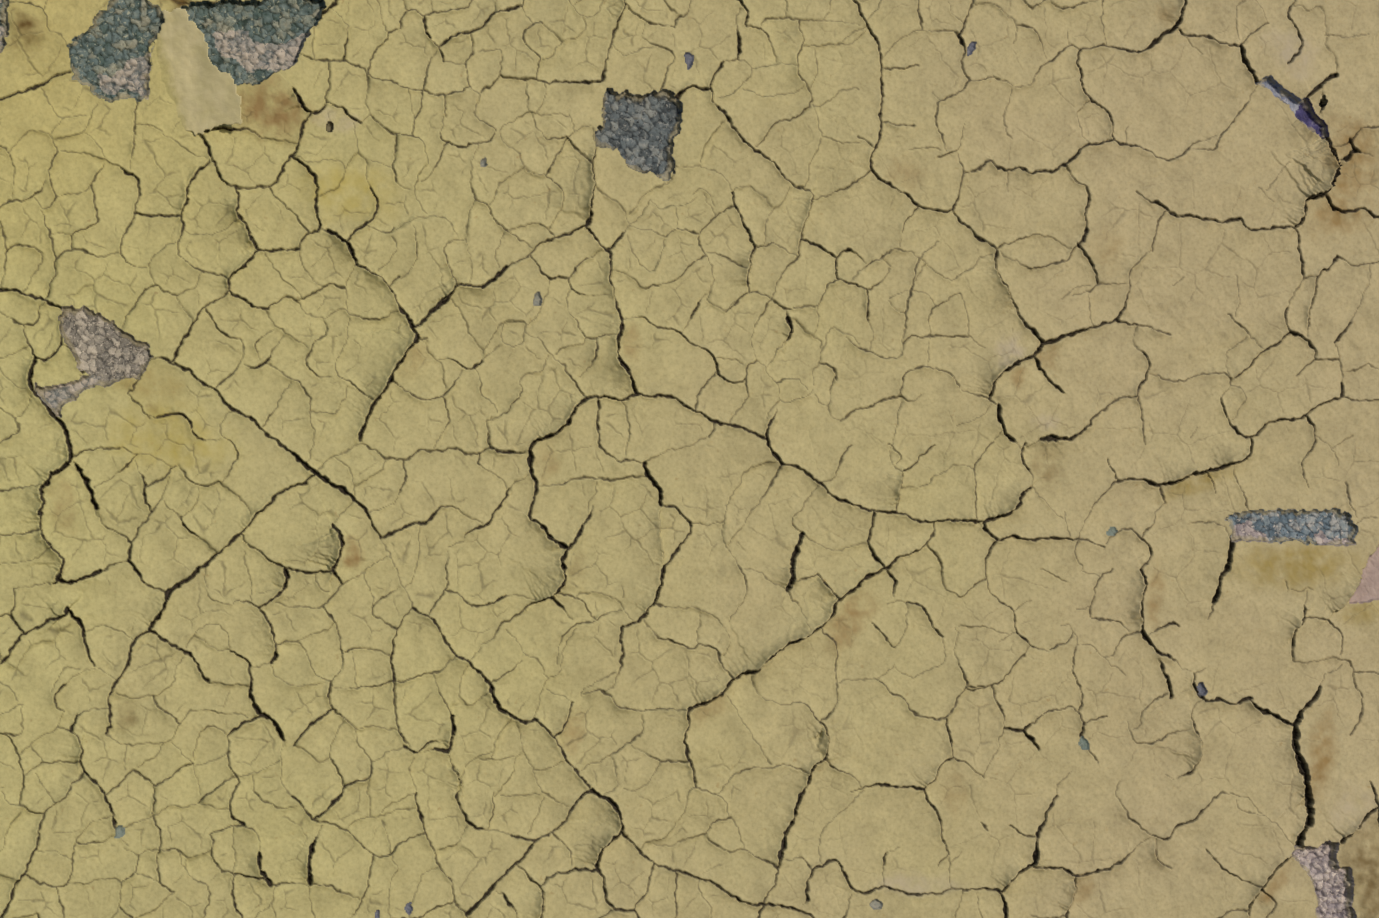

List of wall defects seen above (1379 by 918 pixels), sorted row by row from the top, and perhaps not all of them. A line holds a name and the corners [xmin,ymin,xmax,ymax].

crack [0,324,122,588]
peeling [35,305,154,418]
peeling [67,0,326,136]
crack [0,0,692,330]
peeling [595,88,683,181]
crack [674,0,1172,399]
crack [1027,137,1379,448]
peeling [1225,508,1358,546]
peeling [1255,75,1340,208]
crack [170,682,468,918]
crack [1127,658,1343,849]
spalling [1292,840,1357,918]